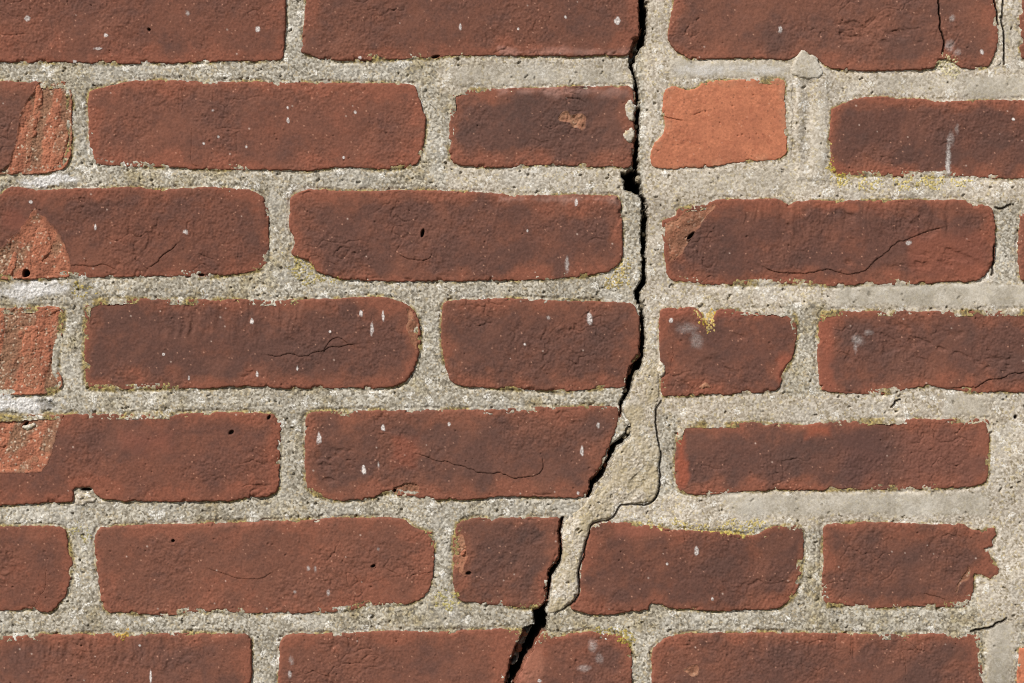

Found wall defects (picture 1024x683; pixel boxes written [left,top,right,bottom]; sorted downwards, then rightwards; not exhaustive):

spalling [0,81,73,175]
spalling [0,208,72,280]
crack [505,0,699,683]
crack [420,454,543,478]